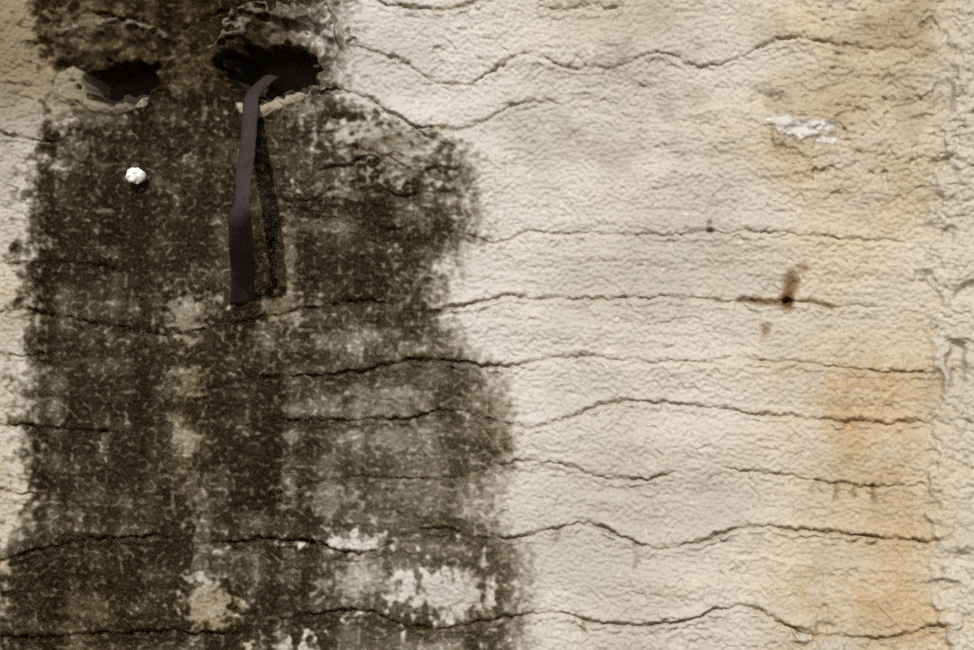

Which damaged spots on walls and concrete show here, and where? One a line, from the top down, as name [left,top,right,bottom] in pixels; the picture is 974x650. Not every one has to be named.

spalling [62,18,114,30]
spalling [209,1,357,48]
spalling [53,65,160,114]
spalling [222,51,319,118]
corrosion [782,278,794,308]
damp [0,0,522,650]